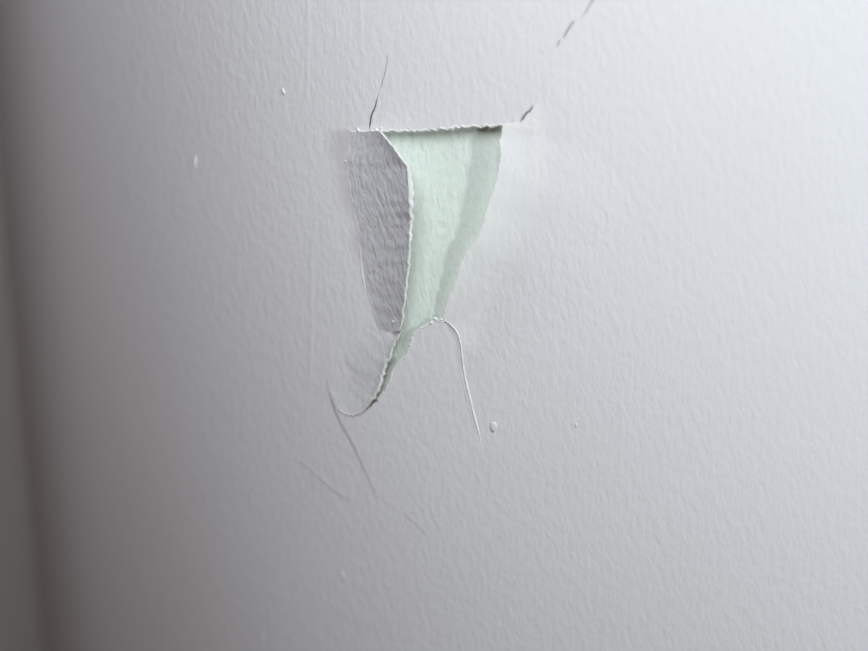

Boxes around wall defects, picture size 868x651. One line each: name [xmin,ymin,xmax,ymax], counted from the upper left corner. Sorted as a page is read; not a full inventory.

flaking render [366,125,502,410]